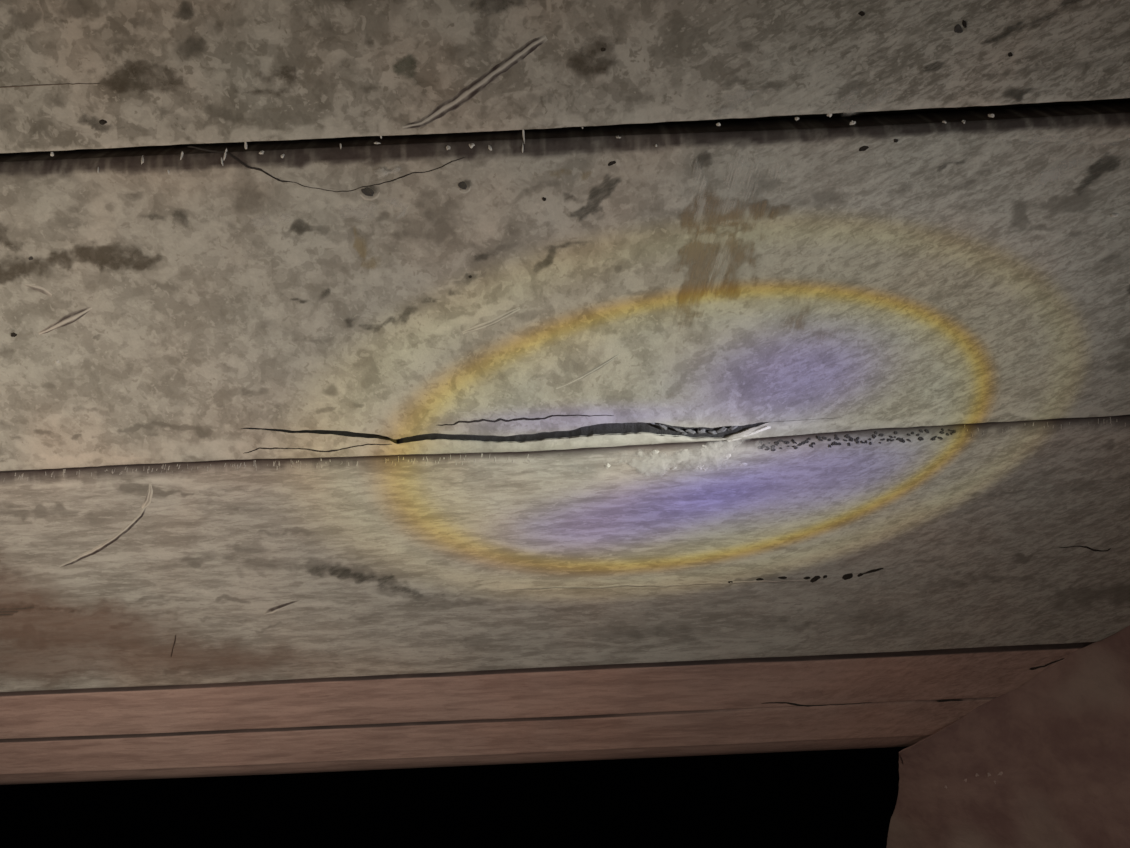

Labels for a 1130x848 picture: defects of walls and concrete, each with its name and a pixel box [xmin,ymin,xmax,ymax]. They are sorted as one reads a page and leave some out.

crack [187,146,465,192]
crack [242,415,771,454]